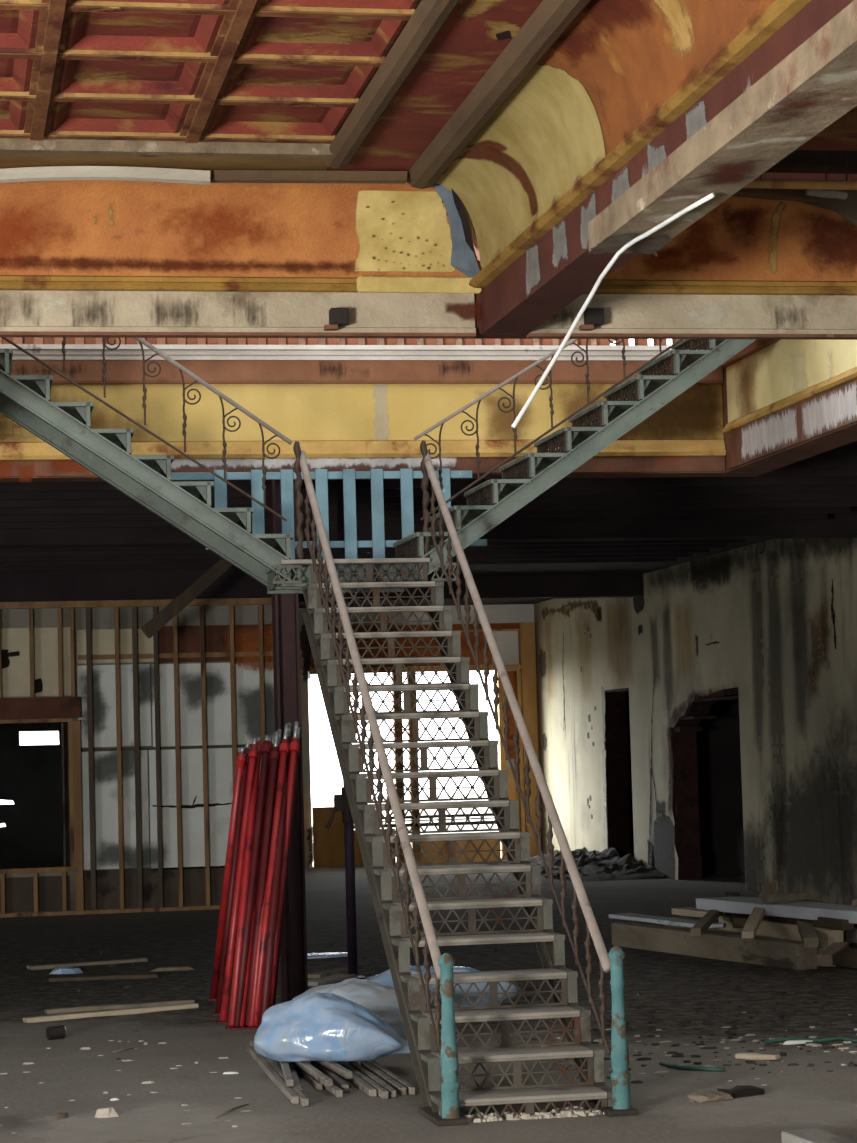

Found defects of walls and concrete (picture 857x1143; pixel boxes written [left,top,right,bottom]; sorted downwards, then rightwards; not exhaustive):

rust [559,0,650,60]
peeling [686,101,707,140]
peeling [355,64,672,296]
rust [0,257,353,271]
damp [156,305,197,323]
peeling [742,383,857,460]
crack [829,579,837,649]